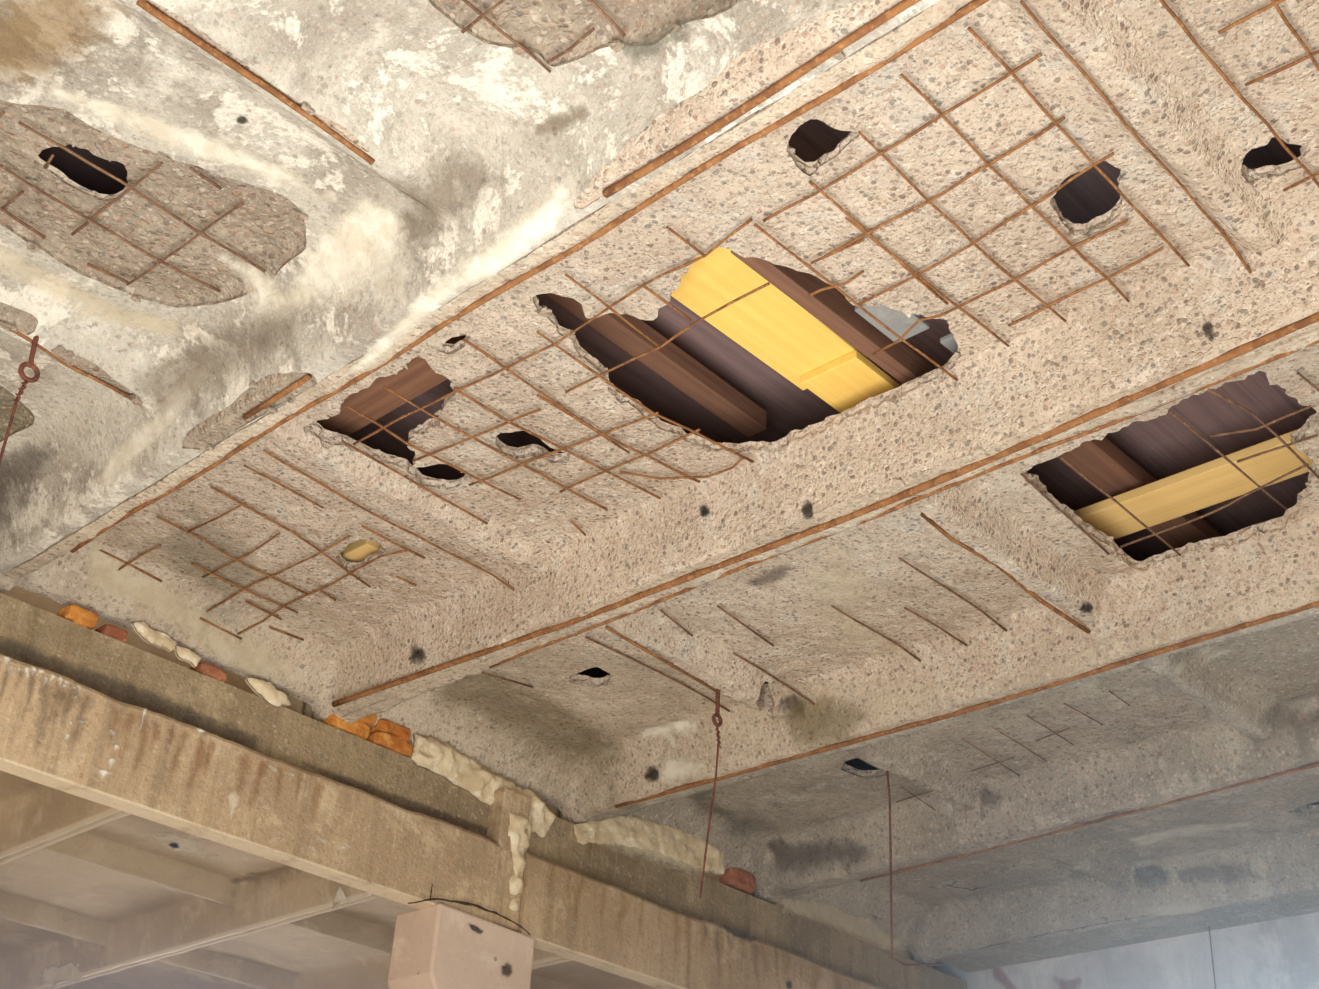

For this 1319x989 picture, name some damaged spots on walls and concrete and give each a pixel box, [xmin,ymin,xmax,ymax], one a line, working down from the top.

spalling [0,385,35,442]
spalling [0,100,308,308]
rust [70,0,989,553]
spalling [145,0,1319,716]
rust [332,312,1319,707]
leakage [4,657,81,698]
leakage [158,835,203,853]